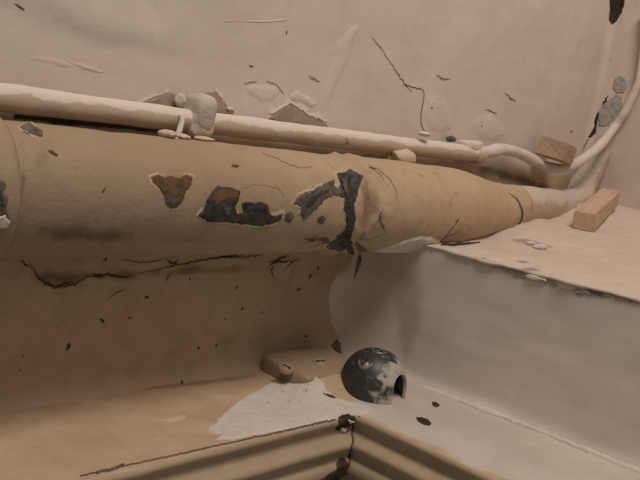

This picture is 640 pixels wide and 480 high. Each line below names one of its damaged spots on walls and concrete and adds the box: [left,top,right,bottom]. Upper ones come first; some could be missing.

flaking render [135,88,178,108]
flaking render [204,88,234,114]
peeling [244,81,328,127]
crack [372,37,425,131]
rust [148,172,195,211]
peeling [284,169,367,255]
crack [80,418,336,477]
peeling [207,377,371,480]